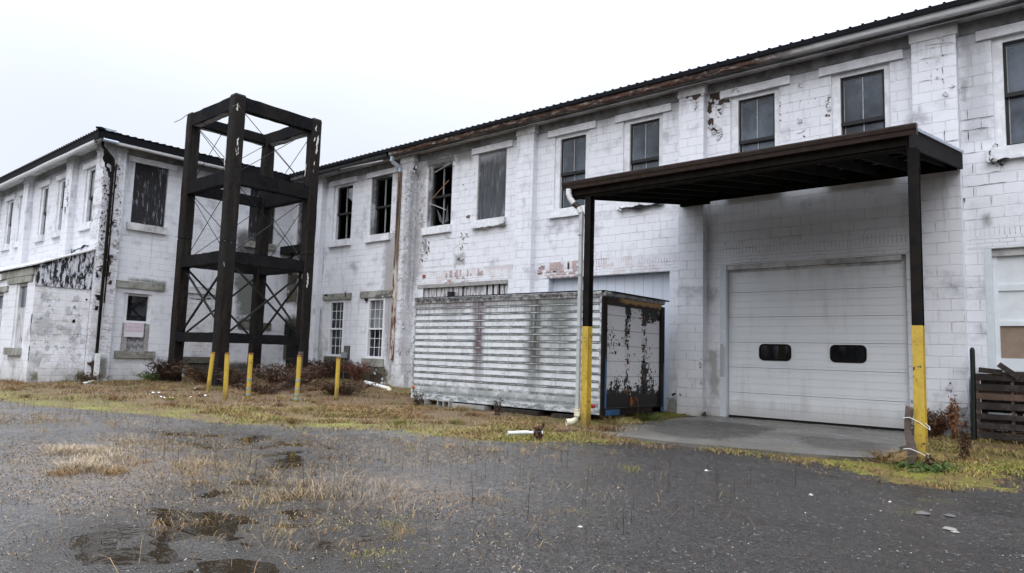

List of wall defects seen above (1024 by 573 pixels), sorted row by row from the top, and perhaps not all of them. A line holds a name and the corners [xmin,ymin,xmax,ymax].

peeling [683,86,740,140]
peeling [71,151,124,285]
peeling [537,261,578,278]